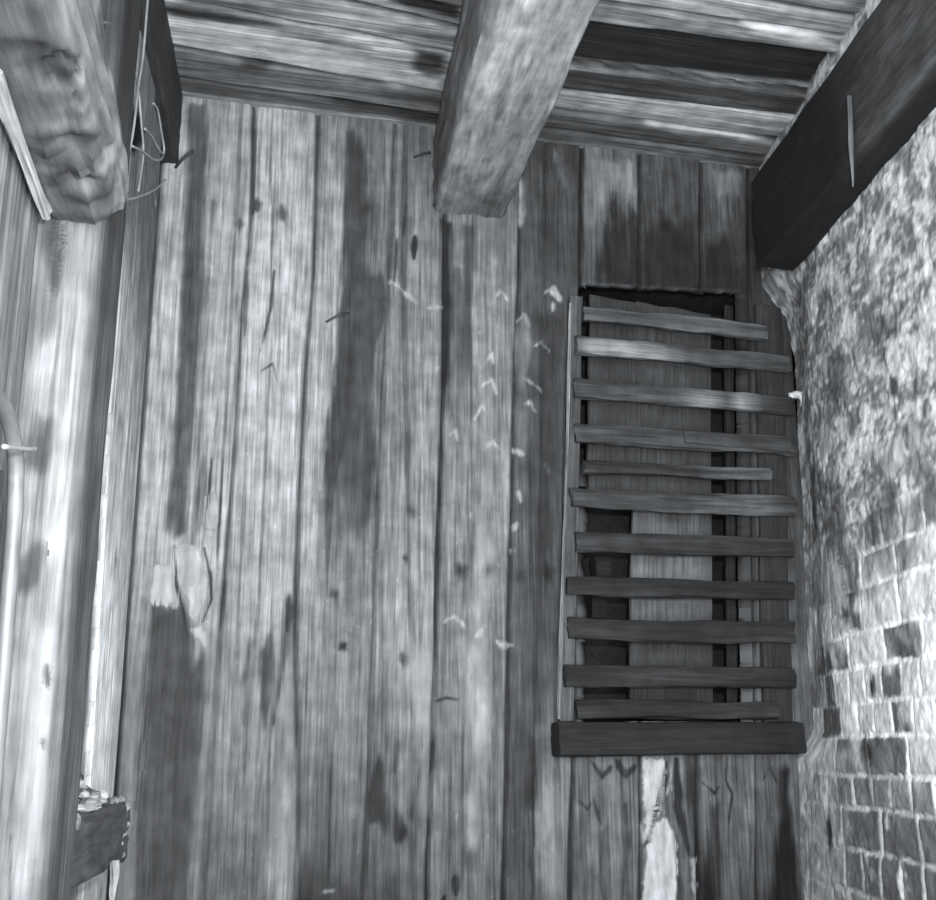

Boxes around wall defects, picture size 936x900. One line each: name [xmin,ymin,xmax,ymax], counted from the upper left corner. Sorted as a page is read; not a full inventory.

water stain [326,132,384,516]
peeling [203,492,219,530]
peeling [149,543,207,647]
peeling [593,757,678,900]
peeling [690,857,698,900]